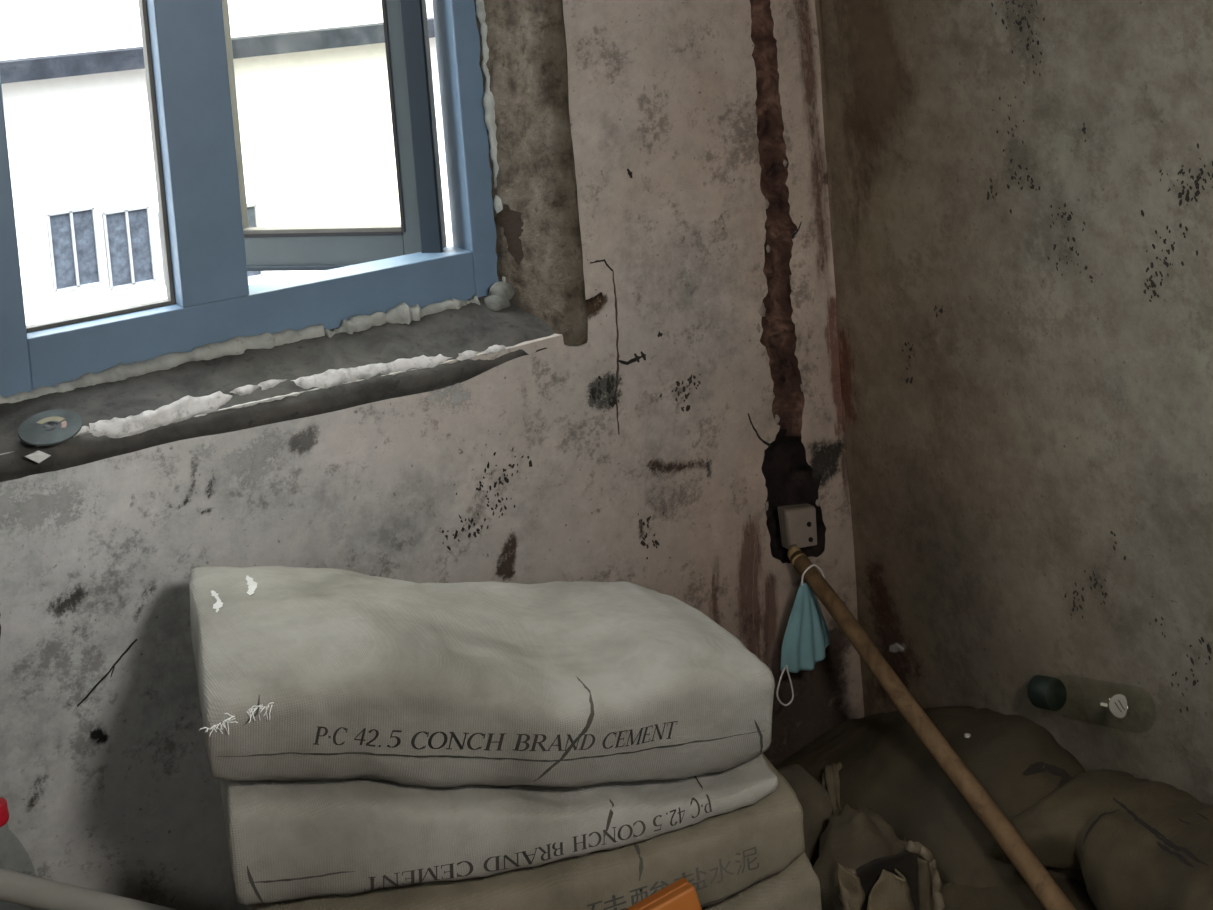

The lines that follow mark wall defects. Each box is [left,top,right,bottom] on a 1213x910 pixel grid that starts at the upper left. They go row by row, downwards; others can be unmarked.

water stain [1159,143,1213,206]
water stain [1143,223,1188,302]
crack [590,259,643,435]
water stain [440,447,532,550]
water stain [496,534,517,580]